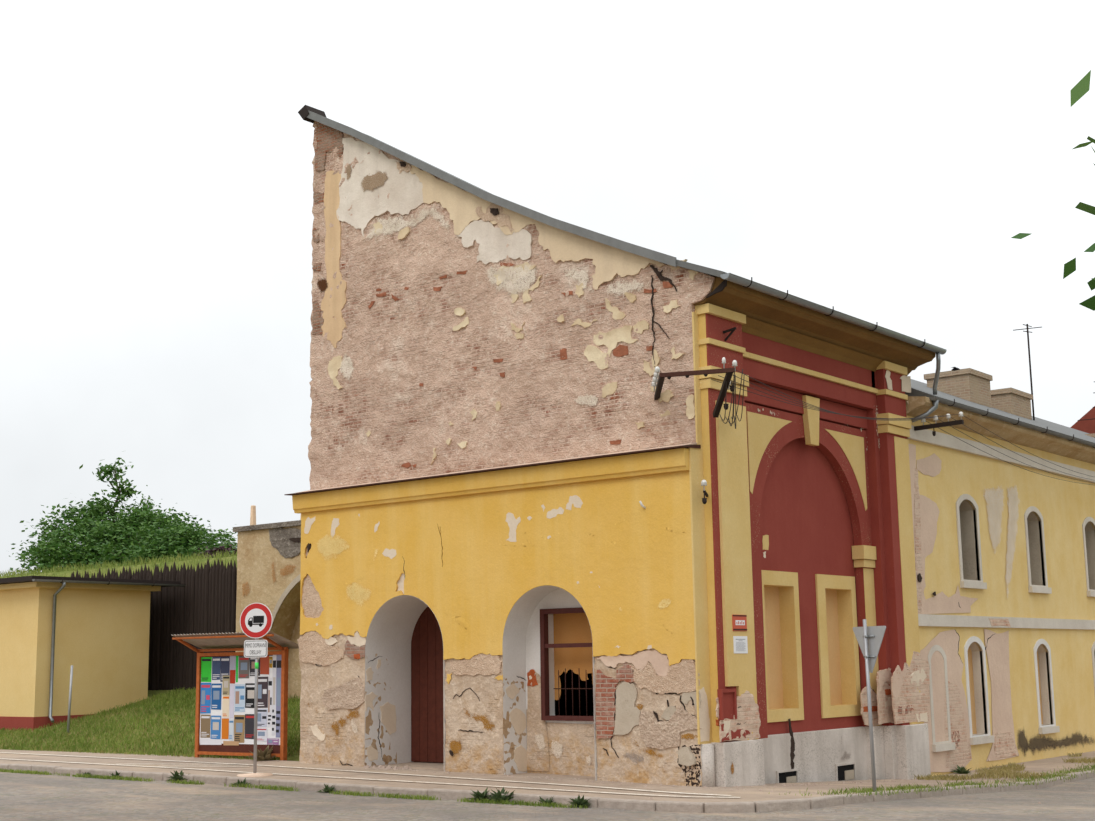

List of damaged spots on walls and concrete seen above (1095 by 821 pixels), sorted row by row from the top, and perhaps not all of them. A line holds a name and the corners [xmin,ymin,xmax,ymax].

flaking render [308,121,715,490]
crack [650,263,677,372]
peeling [506,495,583,542]
flaking render [908,444,978,614]
flaking render [297,575,397,767]
flaking render [444,653,549,775]
flaking render [594,645,761,787]
flaking render [860,629,972,772]
flaking render [984,618,1019,761]